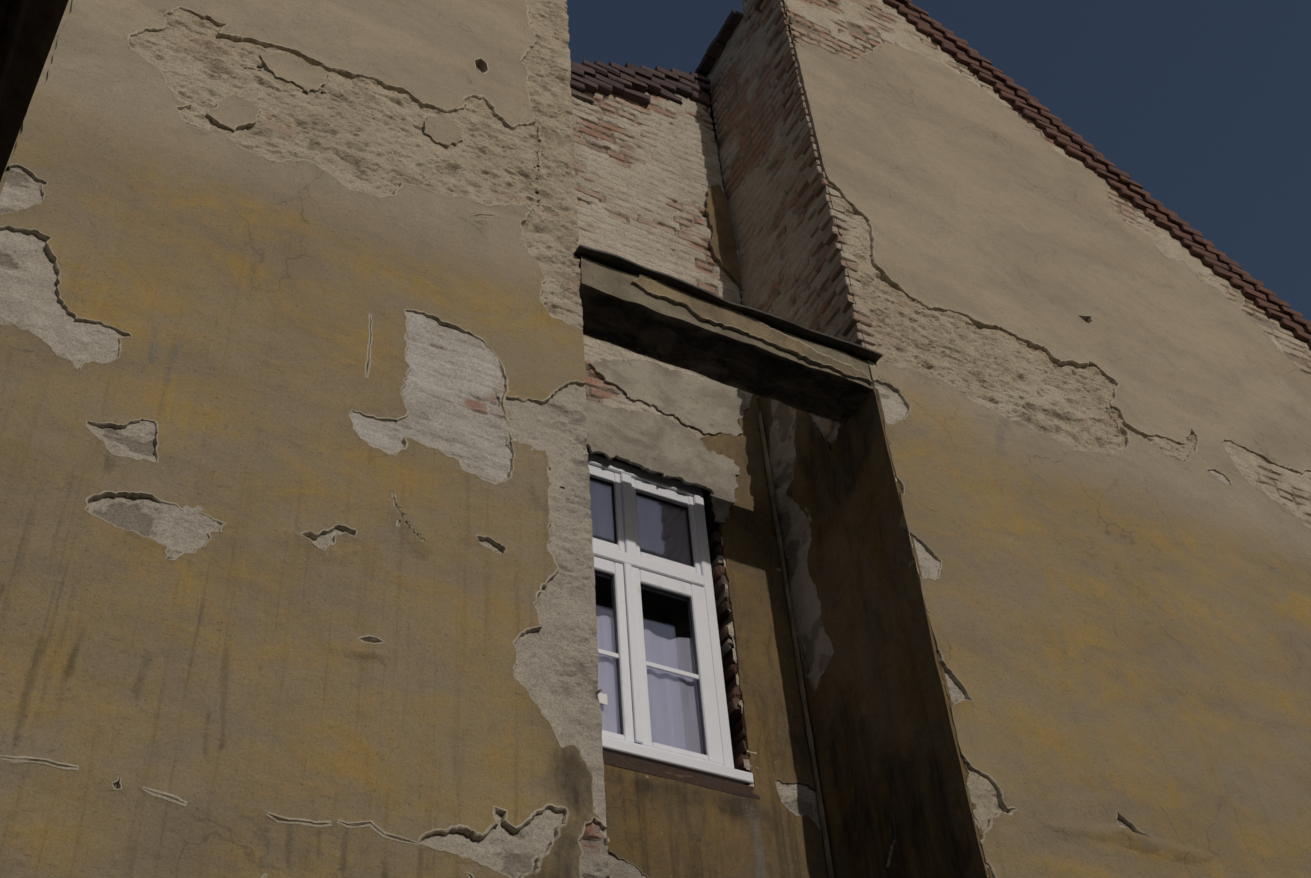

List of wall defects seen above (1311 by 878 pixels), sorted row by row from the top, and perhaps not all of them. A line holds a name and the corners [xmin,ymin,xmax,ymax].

flaking render [127,0,583,329]
flaking render [784,0,1095,174]
flaking render [0,164,133,371]
flaking render [631,177,1199,463]
flaking render [1107,187,1311,378]
flaking render [86,418,159,463]
flaking render [84,491,227,560]
spalling [348,309,751,878]
flaking render [768,398,835,691]
flaking render [1207,439,1311,529]
flaking render [775,779,823,836]
spalling [961,755,1018,844]